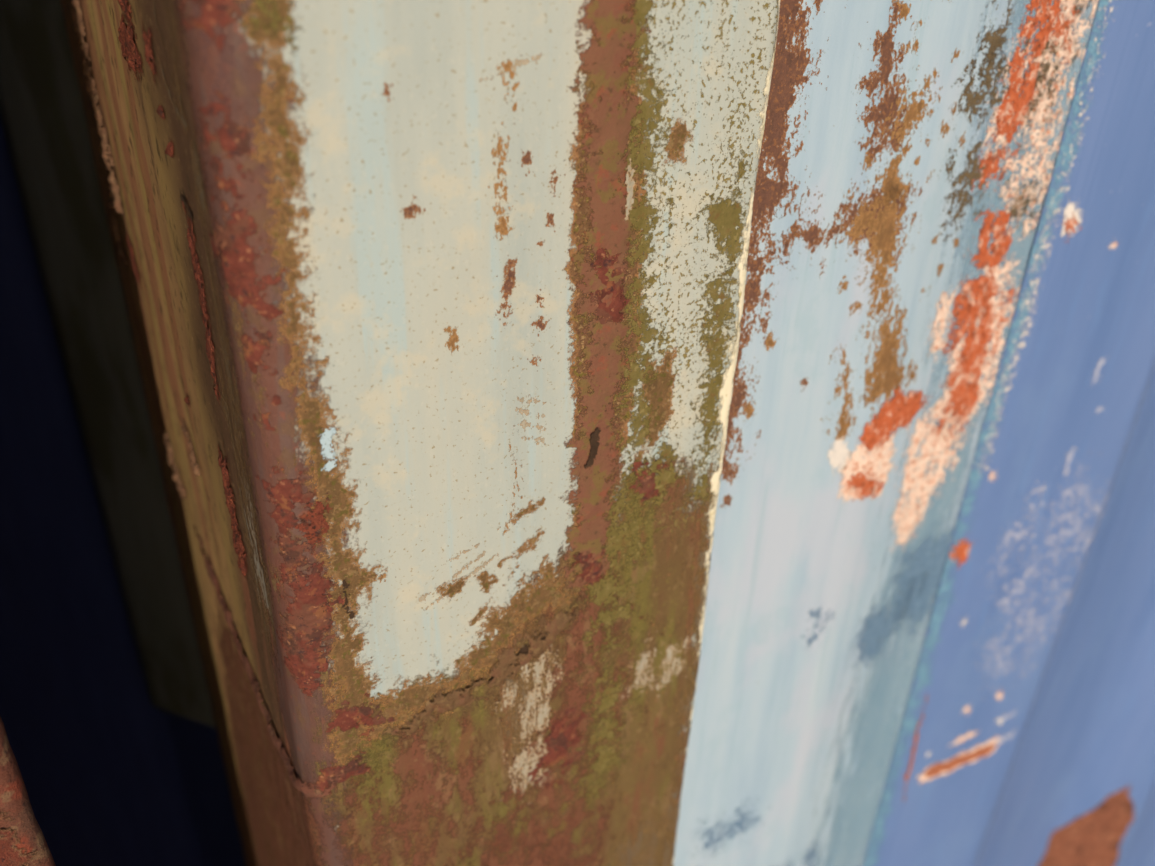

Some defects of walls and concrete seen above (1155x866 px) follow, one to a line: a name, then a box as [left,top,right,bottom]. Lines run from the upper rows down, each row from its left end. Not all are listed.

peeling [757,0,780,158]
peeling [827,0,1099,669]
rust [175,0,965,866]
peeling [690,192,754,731]
peeling [801,606,835,652]
rust [923,744,996,778]
rust [1038,784,1136,866]